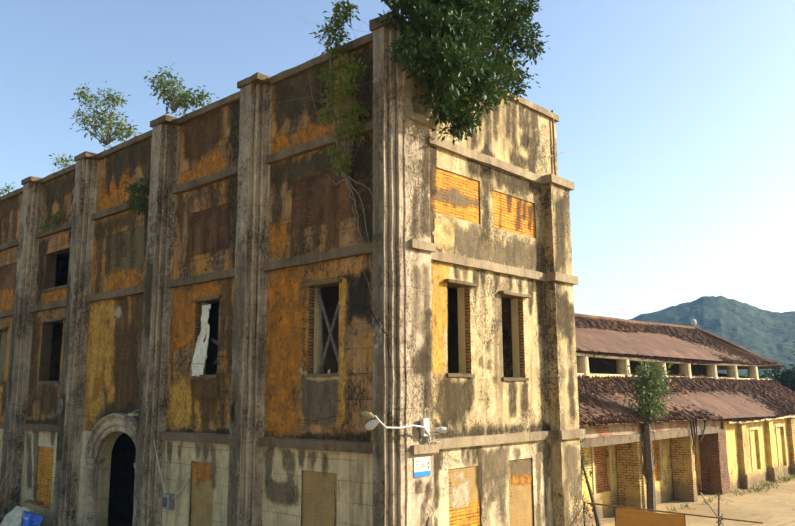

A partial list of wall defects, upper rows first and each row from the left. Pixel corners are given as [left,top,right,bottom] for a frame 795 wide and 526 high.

leakage [414,101,546,324]
leakage [556,196,567,270]
leakage [556,291,576,418]
leakage [264,356,383,526]